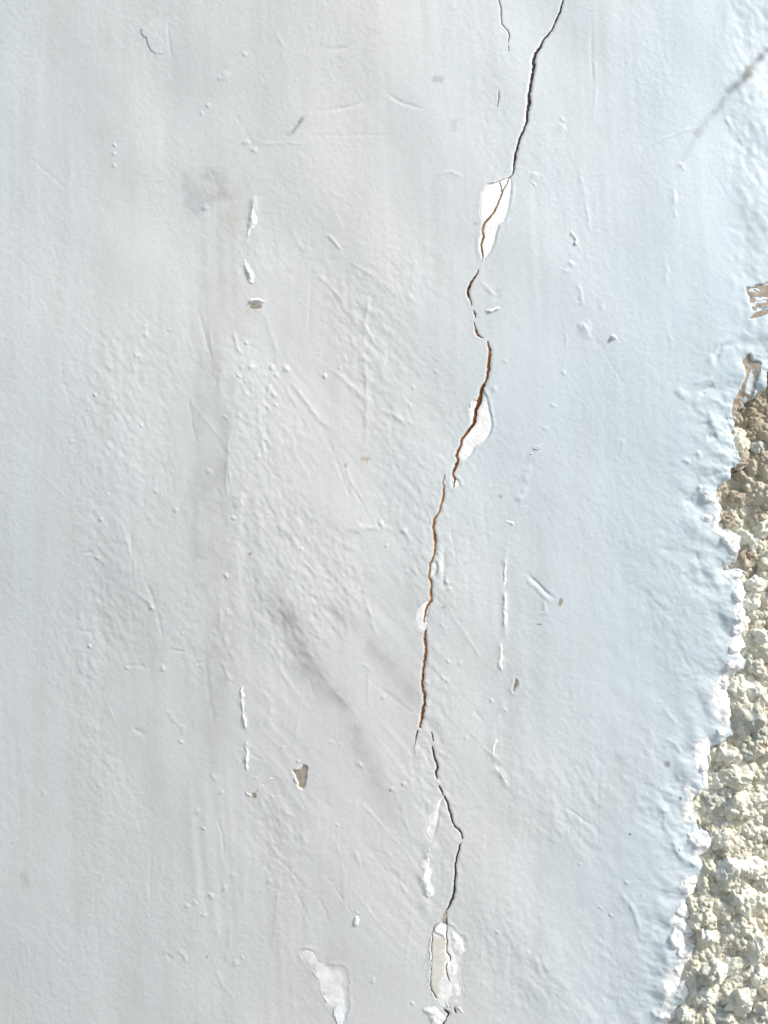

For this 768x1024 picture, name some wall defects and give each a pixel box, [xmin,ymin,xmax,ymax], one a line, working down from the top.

peeling [480,177,511,259]
peeling [746,284,768,319]
peeling [458,393,492,460]
crack [414,0,564,1024]
spalling [658,354,768,1024]
peeling [293,765,307,789]
peeling [301,950,346,1024]
peeling [429,922,465,1013]